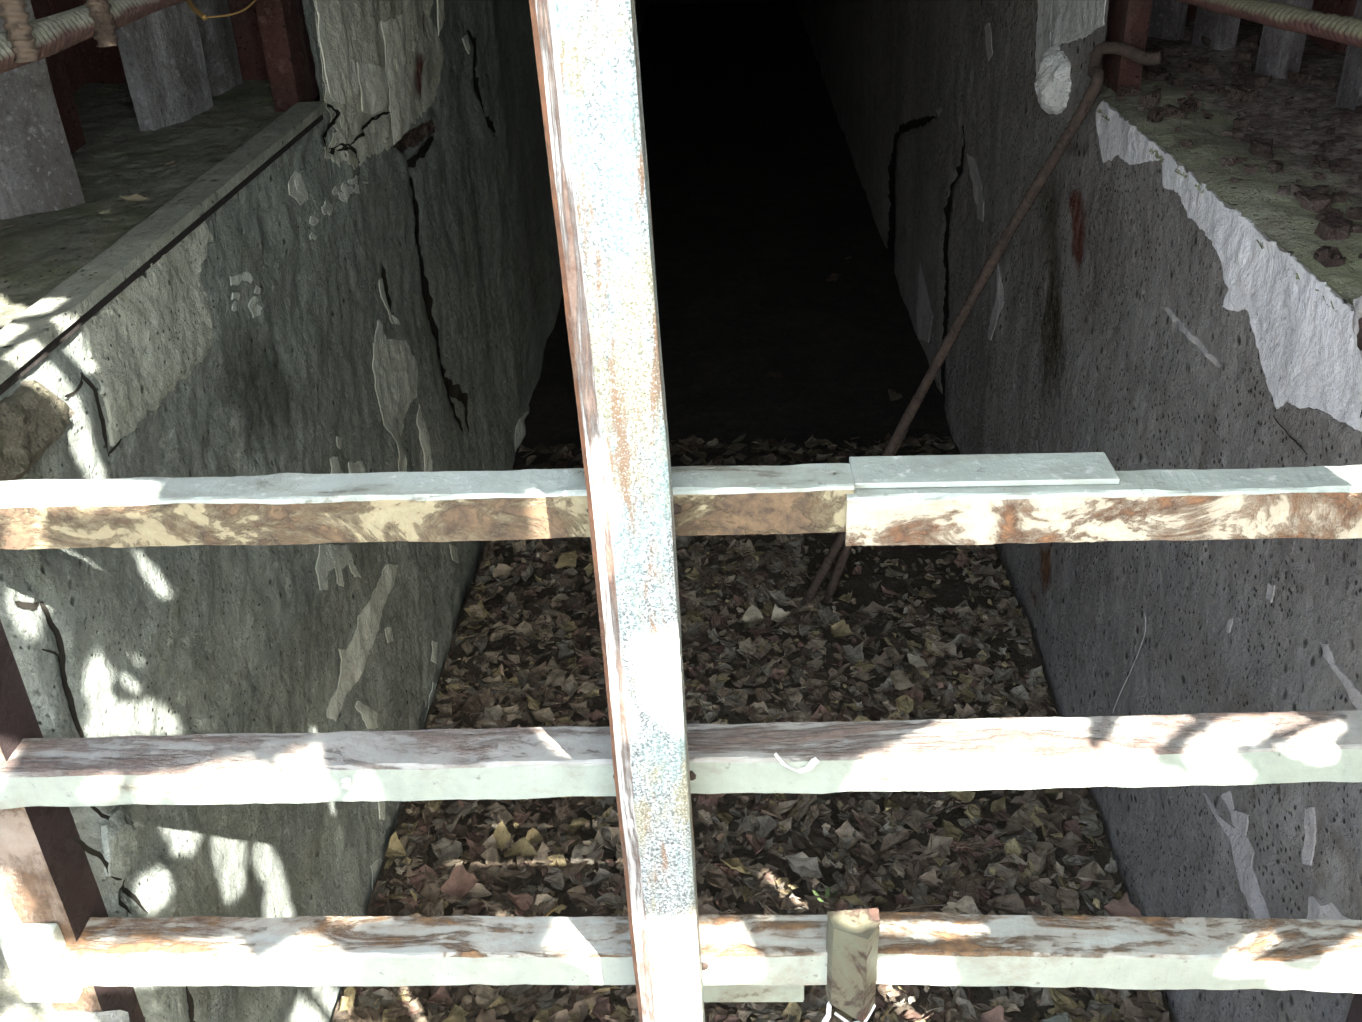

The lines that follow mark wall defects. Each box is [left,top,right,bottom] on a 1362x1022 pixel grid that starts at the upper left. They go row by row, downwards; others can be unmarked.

peeling [1035,0,1106,75]
crack [322,104,390,183]
crack [381,135,469,437]
crack [887,116,965,399]
peeling [1096,101,1362,432]
peeling [372,278,433,472]
peeling [315,544,362,591]
crack [15,601,84,738]
peeling [326,563,398,729]
peeling [370,858,383,891]
peeling [1203,791,1270,919]
crack [186,986,195,1022]